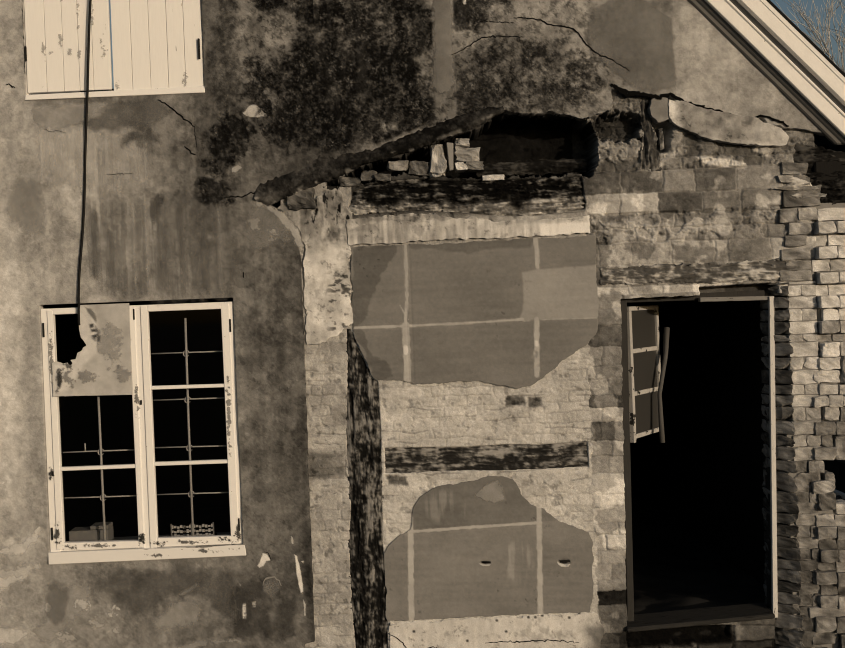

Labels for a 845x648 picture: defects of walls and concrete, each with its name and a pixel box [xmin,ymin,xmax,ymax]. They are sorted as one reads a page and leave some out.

damp [453,0,511,33]
damp [457,41,608,115]
crack [451,17,731,114]
damp [8,99,171,232]
crack [159,100,197,155]
damp [85,0,435,293]
crack [756,114,789,127]
spalling [246,201,303,252]
peeling [295,555,306,616]
crack [489,637,579,645]